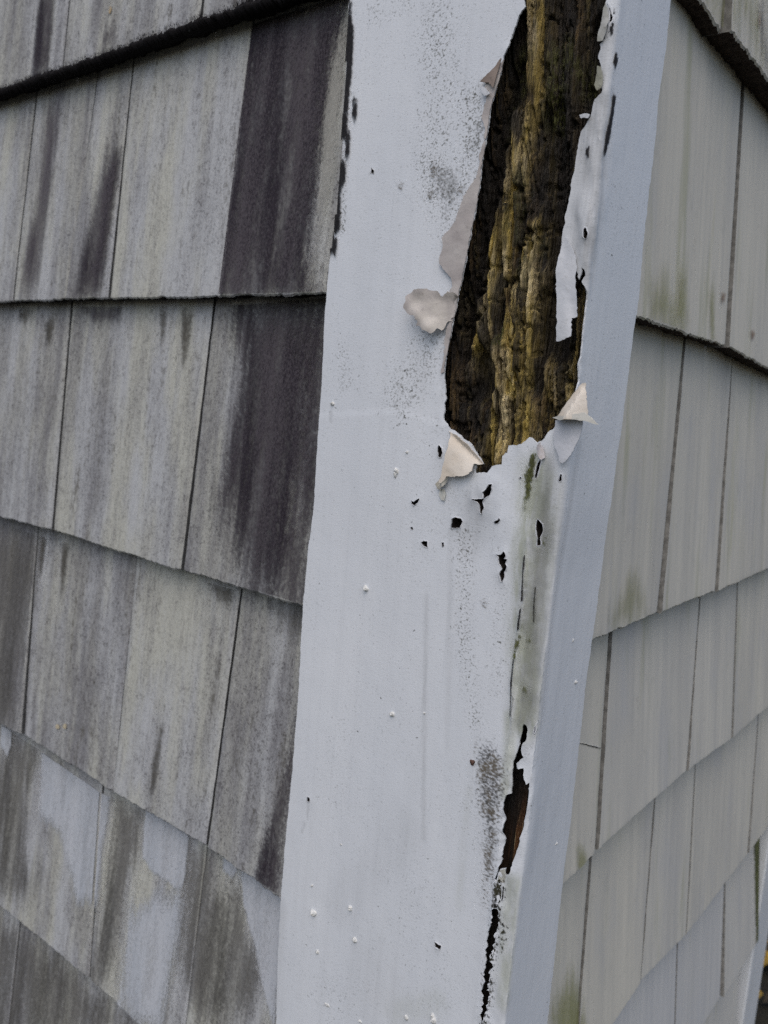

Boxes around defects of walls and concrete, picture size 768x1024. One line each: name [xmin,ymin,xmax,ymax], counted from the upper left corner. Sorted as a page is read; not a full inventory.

peeling [594,66,603,91]
peeling [597,2,609,42]
leakage [0,0,357,634]
peeling [403,58,504,373]
peeling [555,237,578,341]
peeling [435,431,483,501]
peeling [537,383,599,463]
leakage [0,738,41,896]
leakage [0,807,139,1024]
leakage [180,853,260,1024]
leakage [255,716,296,893]
leakage [476,746,508,1024]